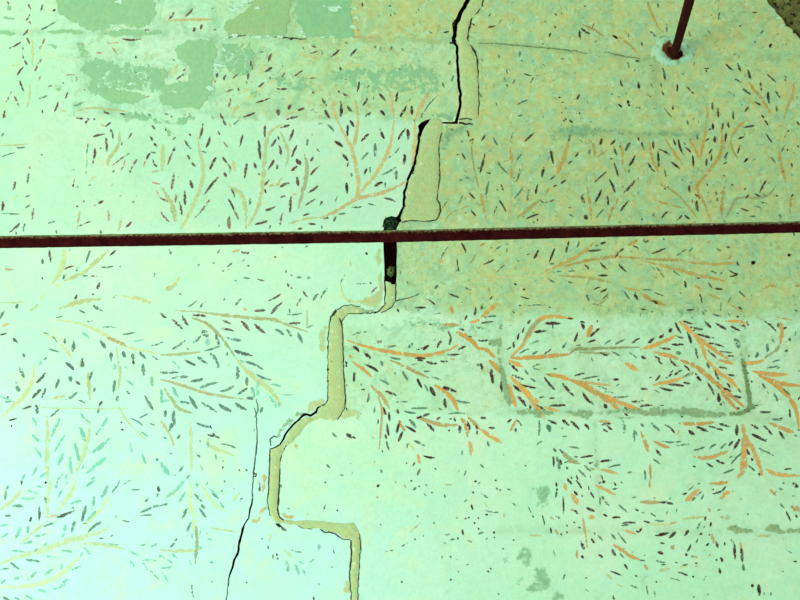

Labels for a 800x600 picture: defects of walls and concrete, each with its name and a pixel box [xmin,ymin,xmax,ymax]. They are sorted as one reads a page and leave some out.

flaking render [48,0,359,136]
flaking render [331,63,439,94]
crack [226,0,640,600]